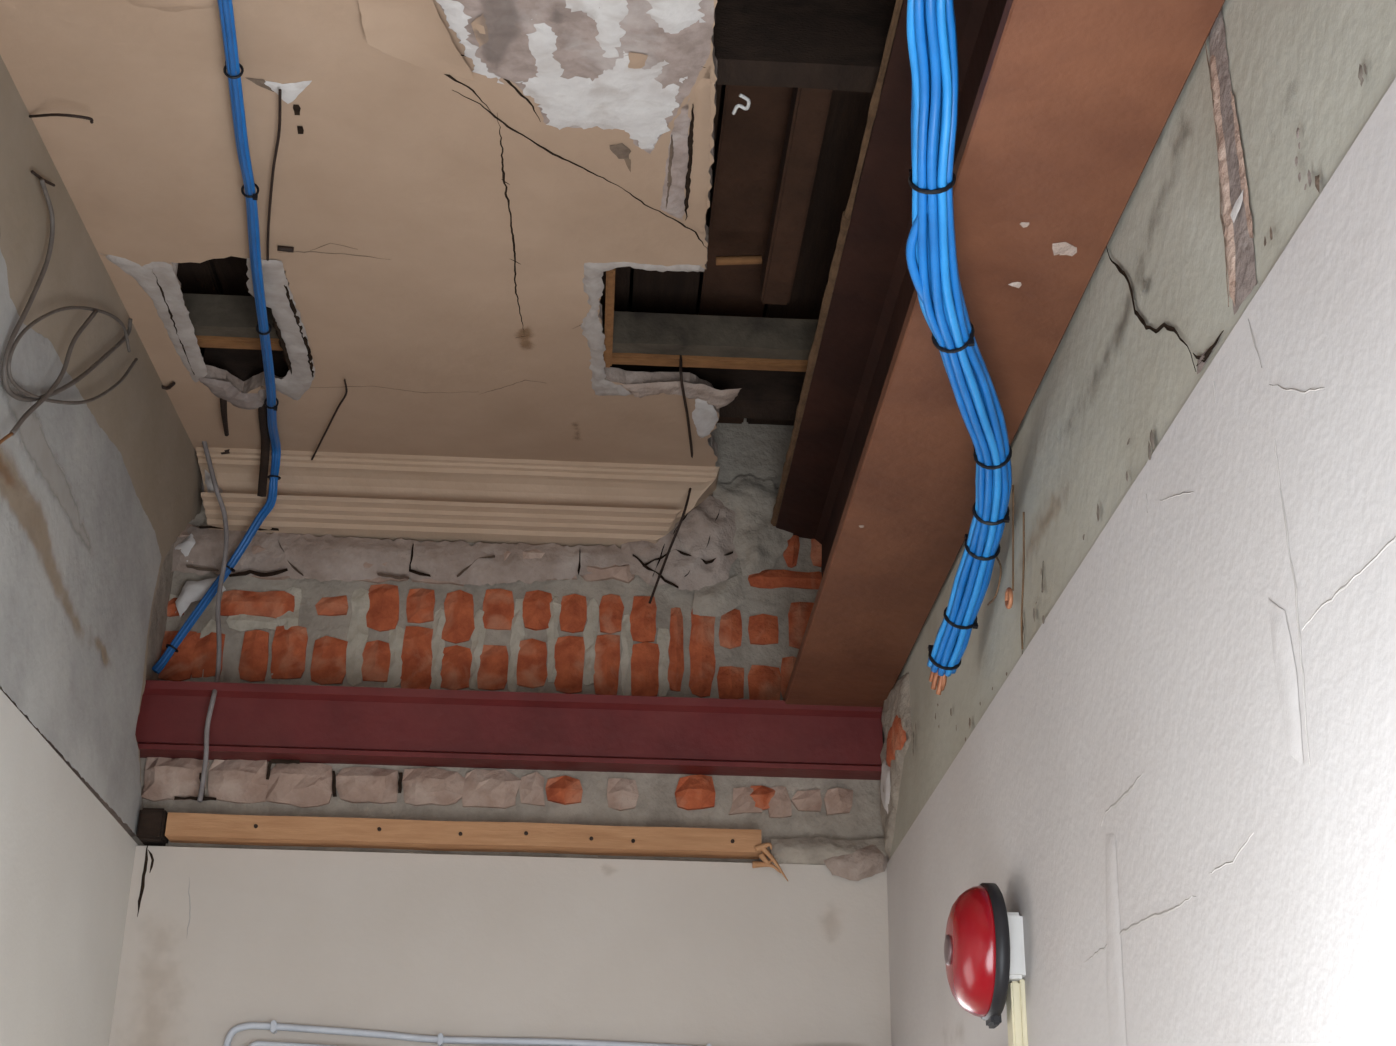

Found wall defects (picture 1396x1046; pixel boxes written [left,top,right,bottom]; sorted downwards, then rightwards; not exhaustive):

spalling [246,78,312,134]
peeling [358,0,714,234]
crack [444,54,704,338]
crack [1106,247,1324,400]
peeling [0,250,793,836]
crack [1146,492,1192,513]
crack [1274,439,1396,766]
spalling [771,672,916,881]
crack [1101,774,1143,826]
crack [1084,834,1253,963]